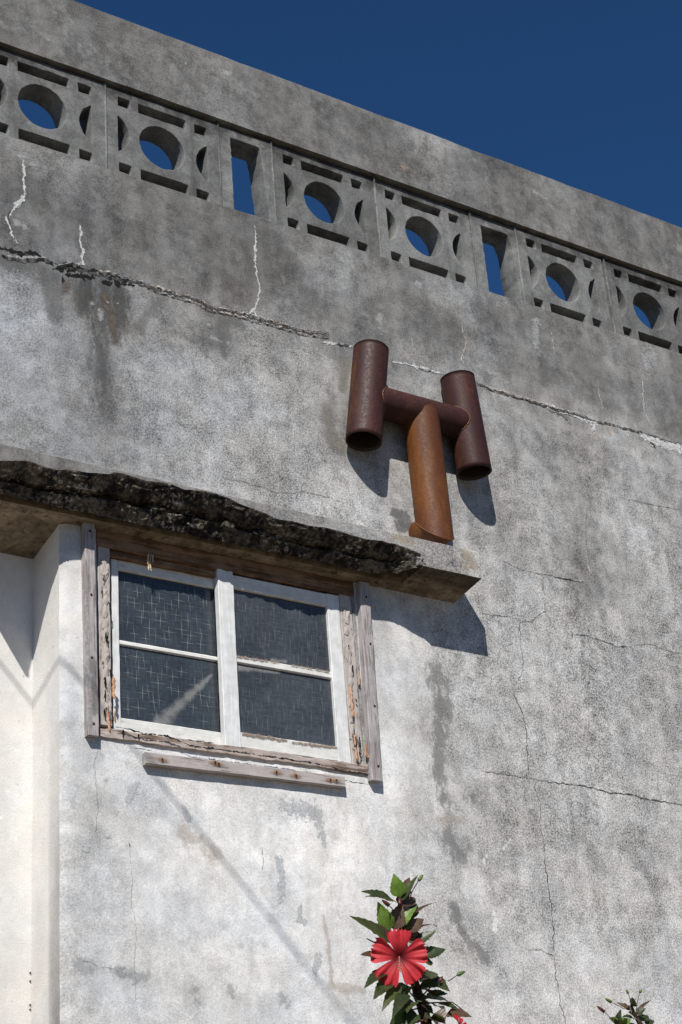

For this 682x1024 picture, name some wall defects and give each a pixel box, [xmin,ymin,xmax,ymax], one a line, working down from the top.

crack [0,160,353,349]
crack [393,323,682,450]
spalling [0,461,426,574]
crack [480,510,682,1023]